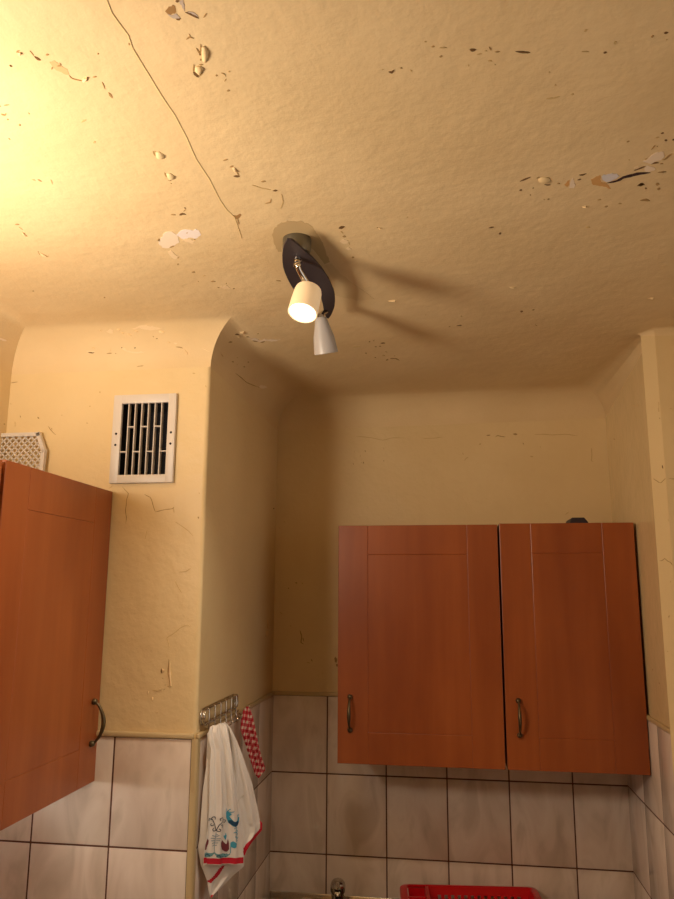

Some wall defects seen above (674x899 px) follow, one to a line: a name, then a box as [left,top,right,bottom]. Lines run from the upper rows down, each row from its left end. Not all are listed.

peeling [158,229,201,265]